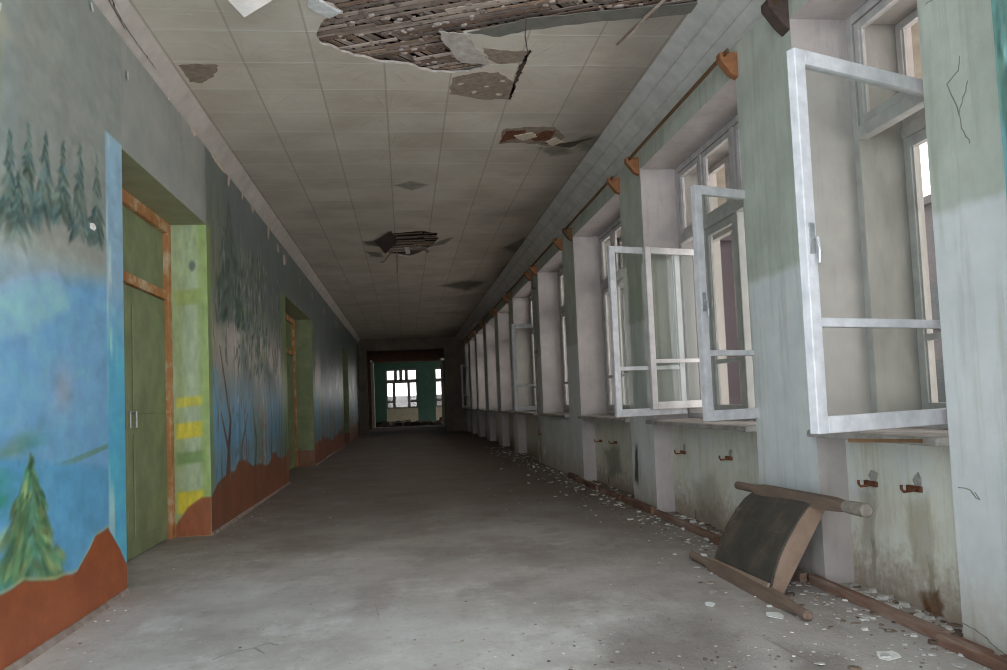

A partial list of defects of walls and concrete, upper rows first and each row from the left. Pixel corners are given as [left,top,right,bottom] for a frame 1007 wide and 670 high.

crack [109,0,154,66]
peeling [178,64,219,83]
peeling [439,31,532,100]